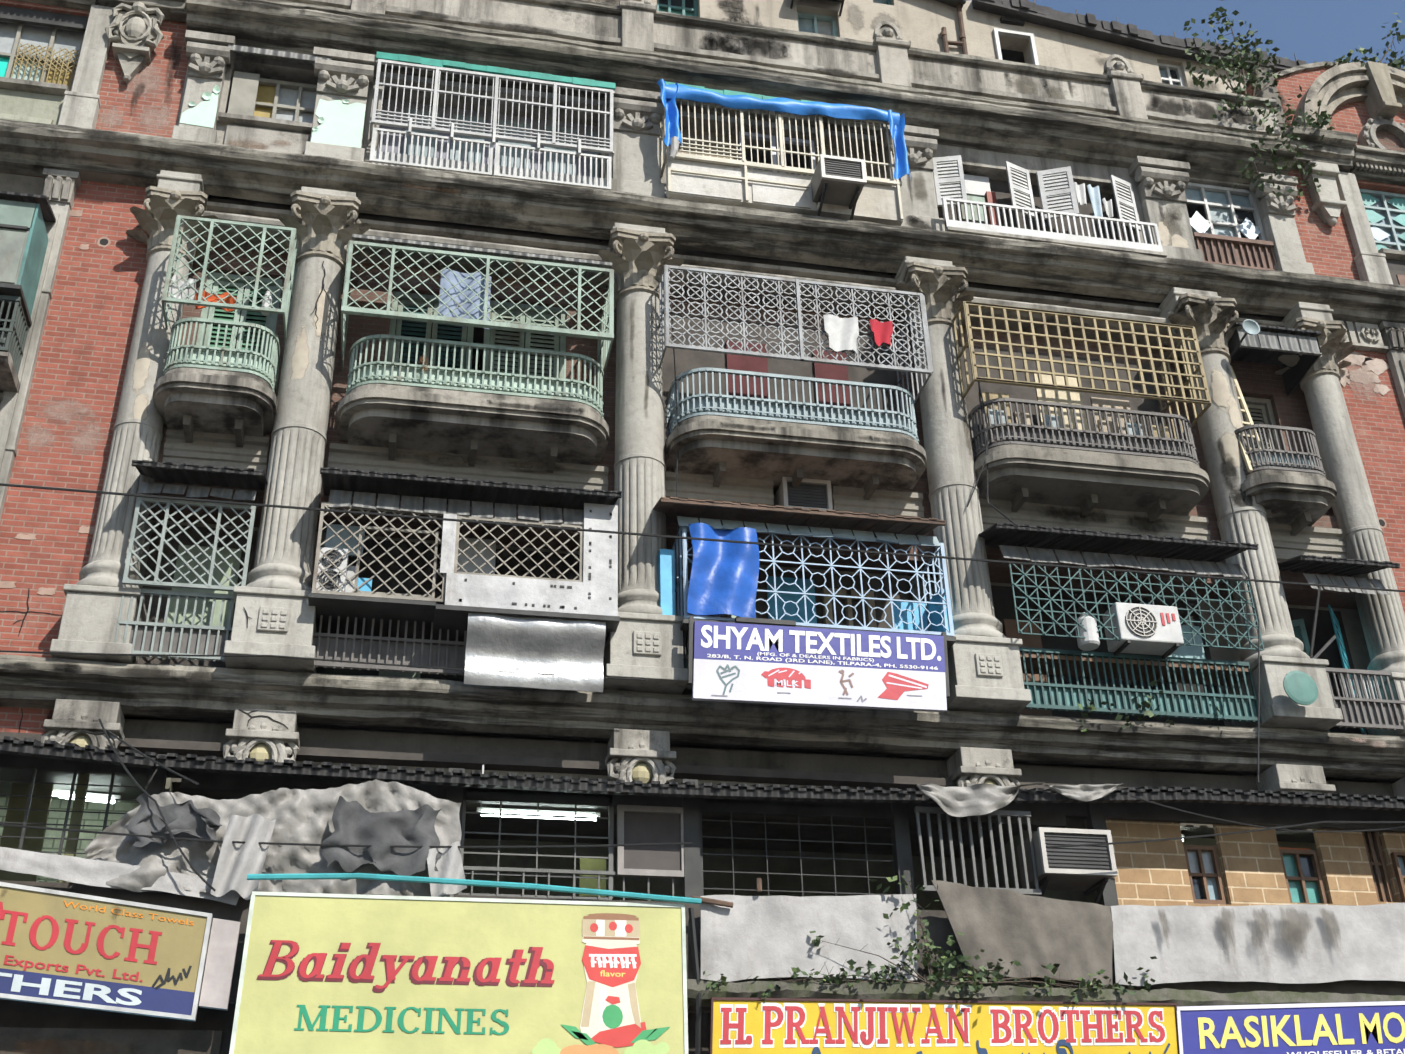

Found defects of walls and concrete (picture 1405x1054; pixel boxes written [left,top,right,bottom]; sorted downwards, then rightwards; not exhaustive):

leakage [700,0,789,61]
peeling [180,85,220,128]
peeling [311,99,366,148]
peeling [1338,351,1390,400]
leakage [1158,912,1169,939]
leakage [1220,908,1235,947]
leakage [1253,909,1340,952]